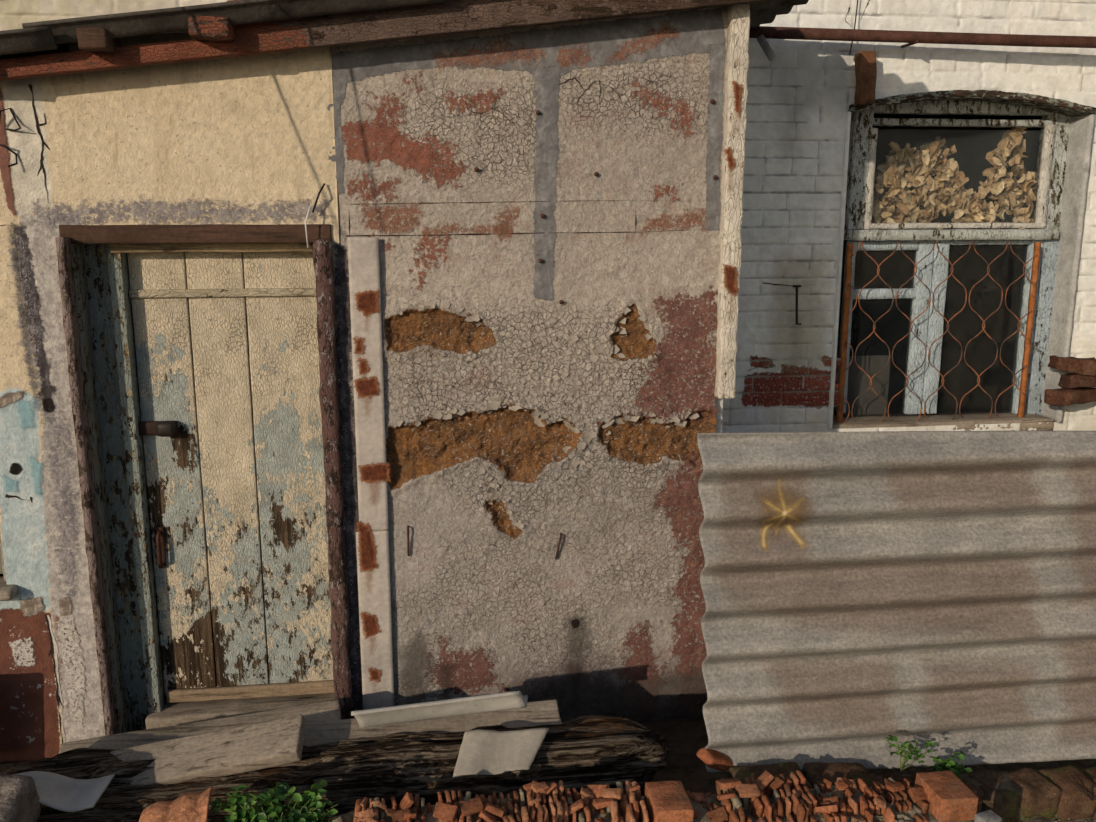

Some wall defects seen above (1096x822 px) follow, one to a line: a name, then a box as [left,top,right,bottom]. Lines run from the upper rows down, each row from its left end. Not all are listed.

peeling [630,78,698,139]
crack [28,84,50,200]
peeling [340,70,520,290]
peeling [641,183,707,235]
spalling [384,303,496,354]
peeling [0,391,54,428]
flaking render [741,355,841,409]
spalling [386,399,582,490]
peeling [1,457,42,495]
peeling [597,286,727,690]
spalling [484,500,524,540]
peeling [423,632,509,697]